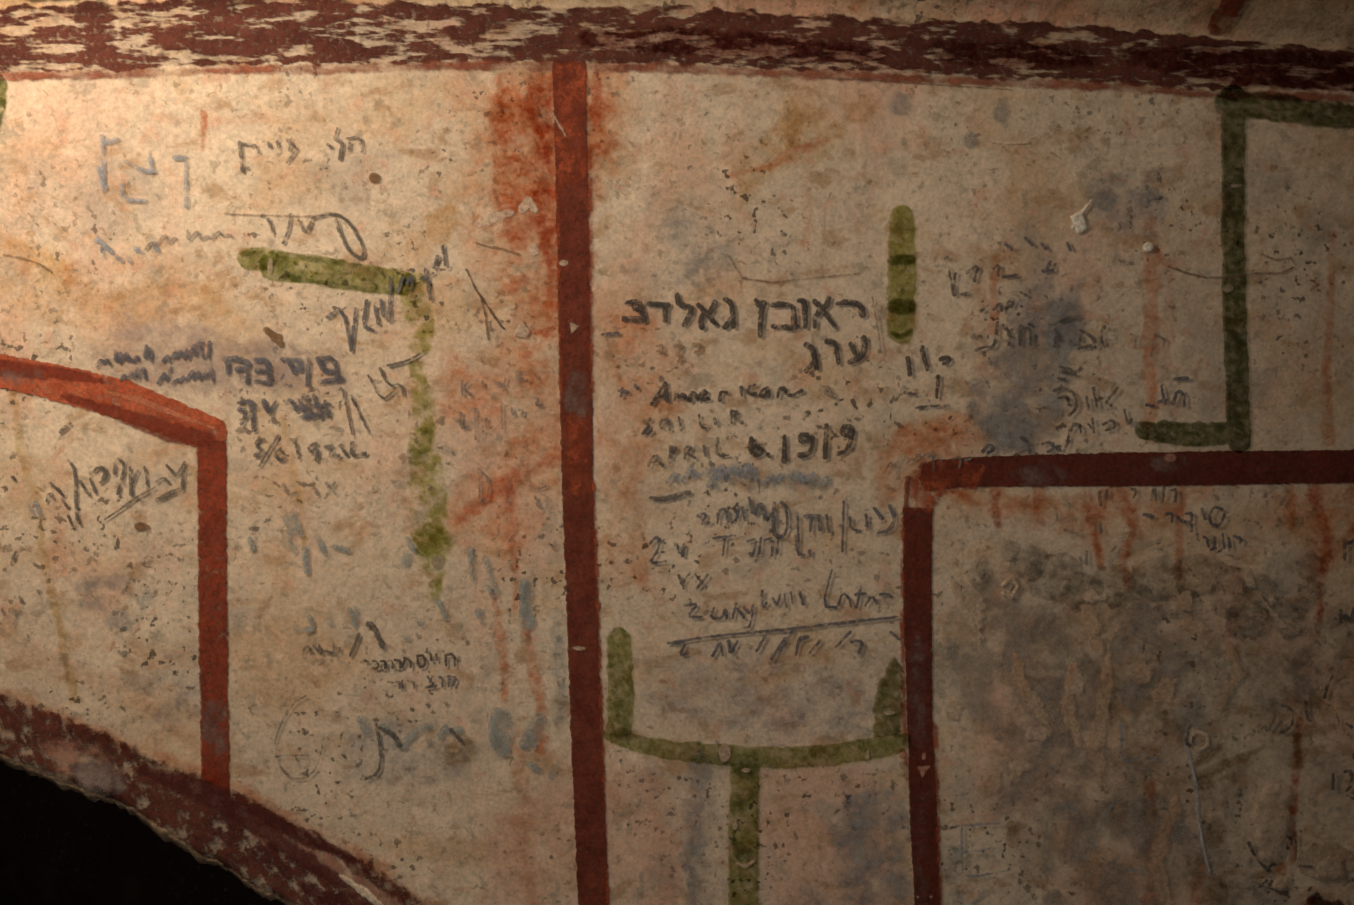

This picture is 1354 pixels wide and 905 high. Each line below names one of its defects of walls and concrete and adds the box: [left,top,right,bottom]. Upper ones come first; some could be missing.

flaking render [339,874,383,905]